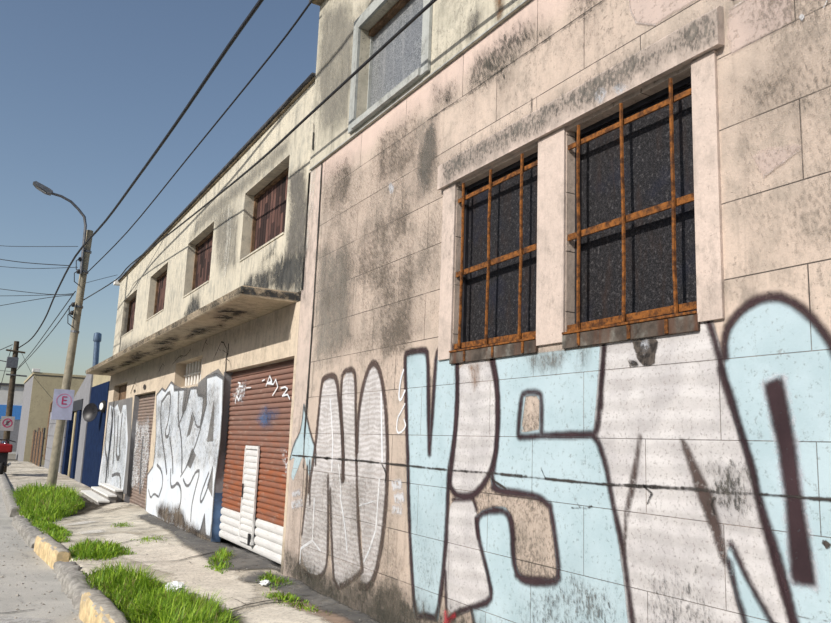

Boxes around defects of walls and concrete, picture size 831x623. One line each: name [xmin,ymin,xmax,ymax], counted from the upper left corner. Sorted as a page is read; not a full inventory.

water stain [319,6,354,128]
water stain [377,11,719,194]
water stain [85,167,307,373]
water stain [317,249,351,359]
water stain [358,193,414,357]